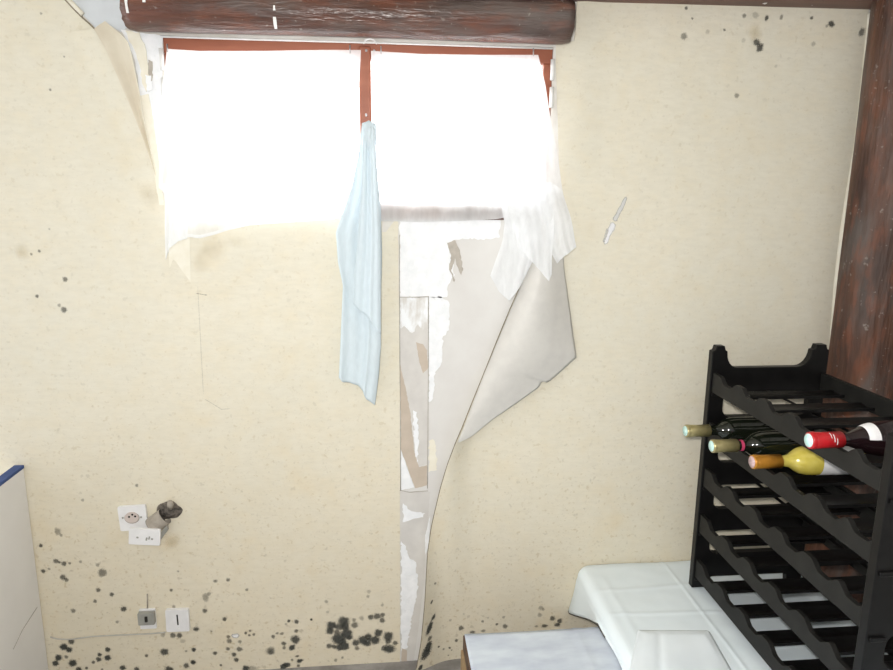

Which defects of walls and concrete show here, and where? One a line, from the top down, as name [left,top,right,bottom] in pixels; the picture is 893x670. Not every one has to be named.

spalling [73,0,163,159]
flaking render [400,220,517,536]
leakage [53,640,111,670]
leakage [268,620,302,669]
leakage [327,613,398,653]
leakage [418,600,484,670]